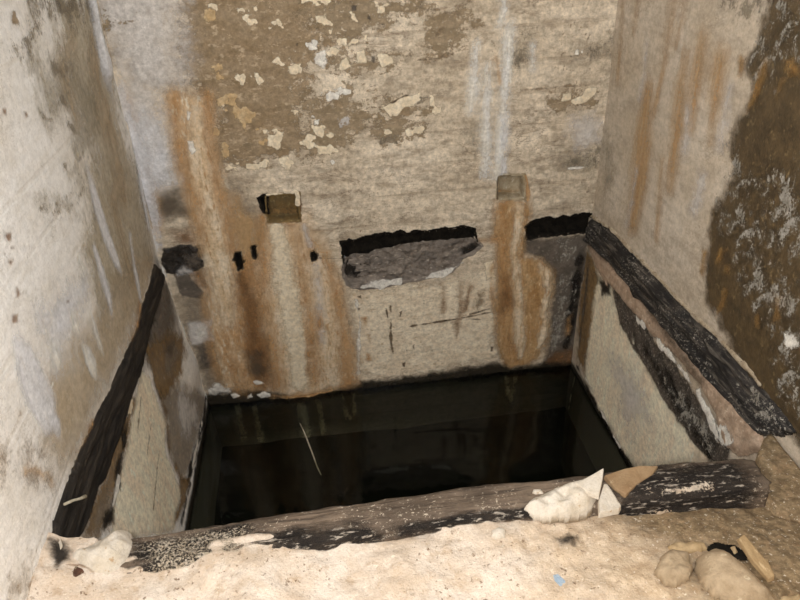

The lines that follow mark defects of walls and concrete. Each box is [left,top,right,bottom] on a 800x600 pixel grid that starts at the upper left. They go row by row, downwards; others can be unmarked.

rust [166,90,269,392]
peeling [293,0,485,164]
spalling [339,225,498,382]
spalling [524,212,592,240]
peeling [527,84,599,113]
rust [629,89,650,229]
damp [700,0,800,446]